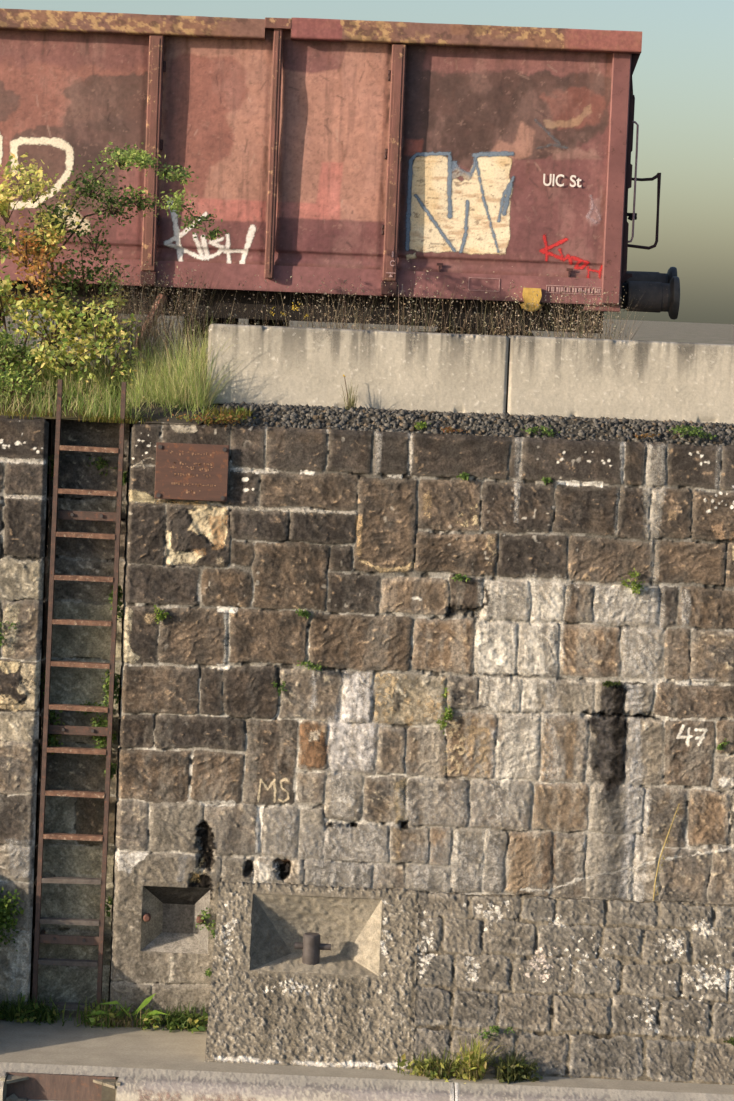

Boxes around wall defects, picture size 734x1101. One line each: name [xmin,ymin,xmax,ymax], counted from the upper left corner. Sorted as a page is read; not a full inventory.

peeling [128,490,228,566]
efflorescence [643,444,667,545]
peeling [31,561,43,597]
peeling [0,604,41,712]
water stain [588,563,663,902]